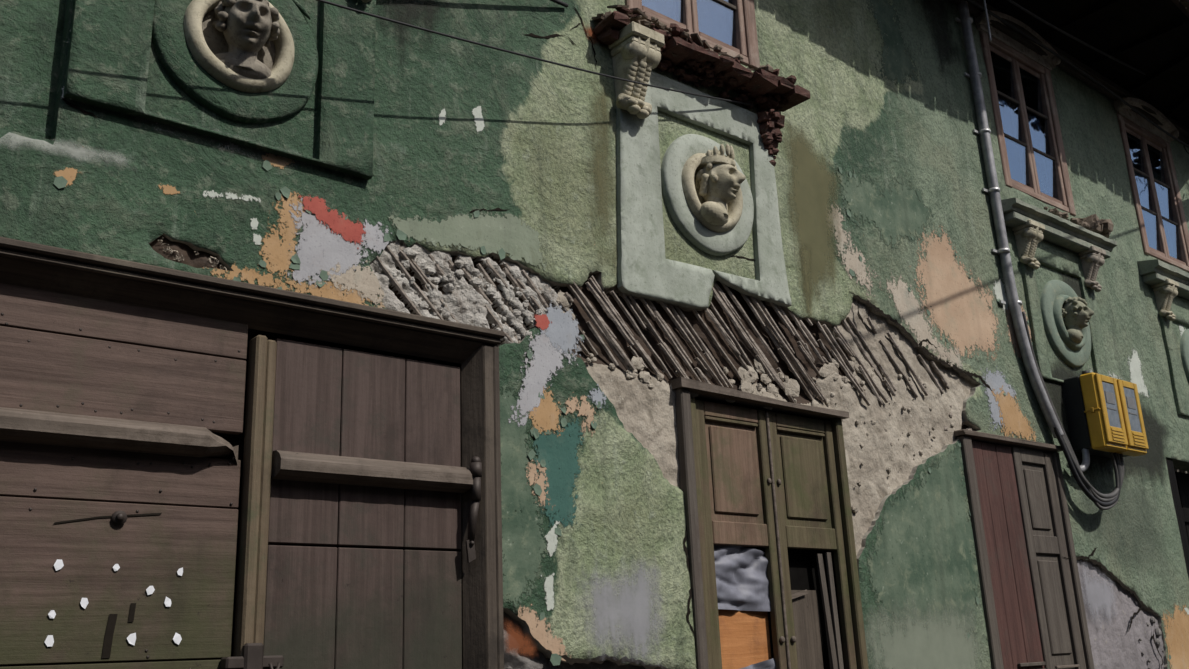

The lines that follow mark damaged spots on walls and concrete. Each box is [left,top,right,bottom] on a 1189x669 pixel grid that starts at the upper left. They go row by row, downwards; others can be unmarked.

spalling [149,163,1036,669]
spalling [1077,559,1189,669]